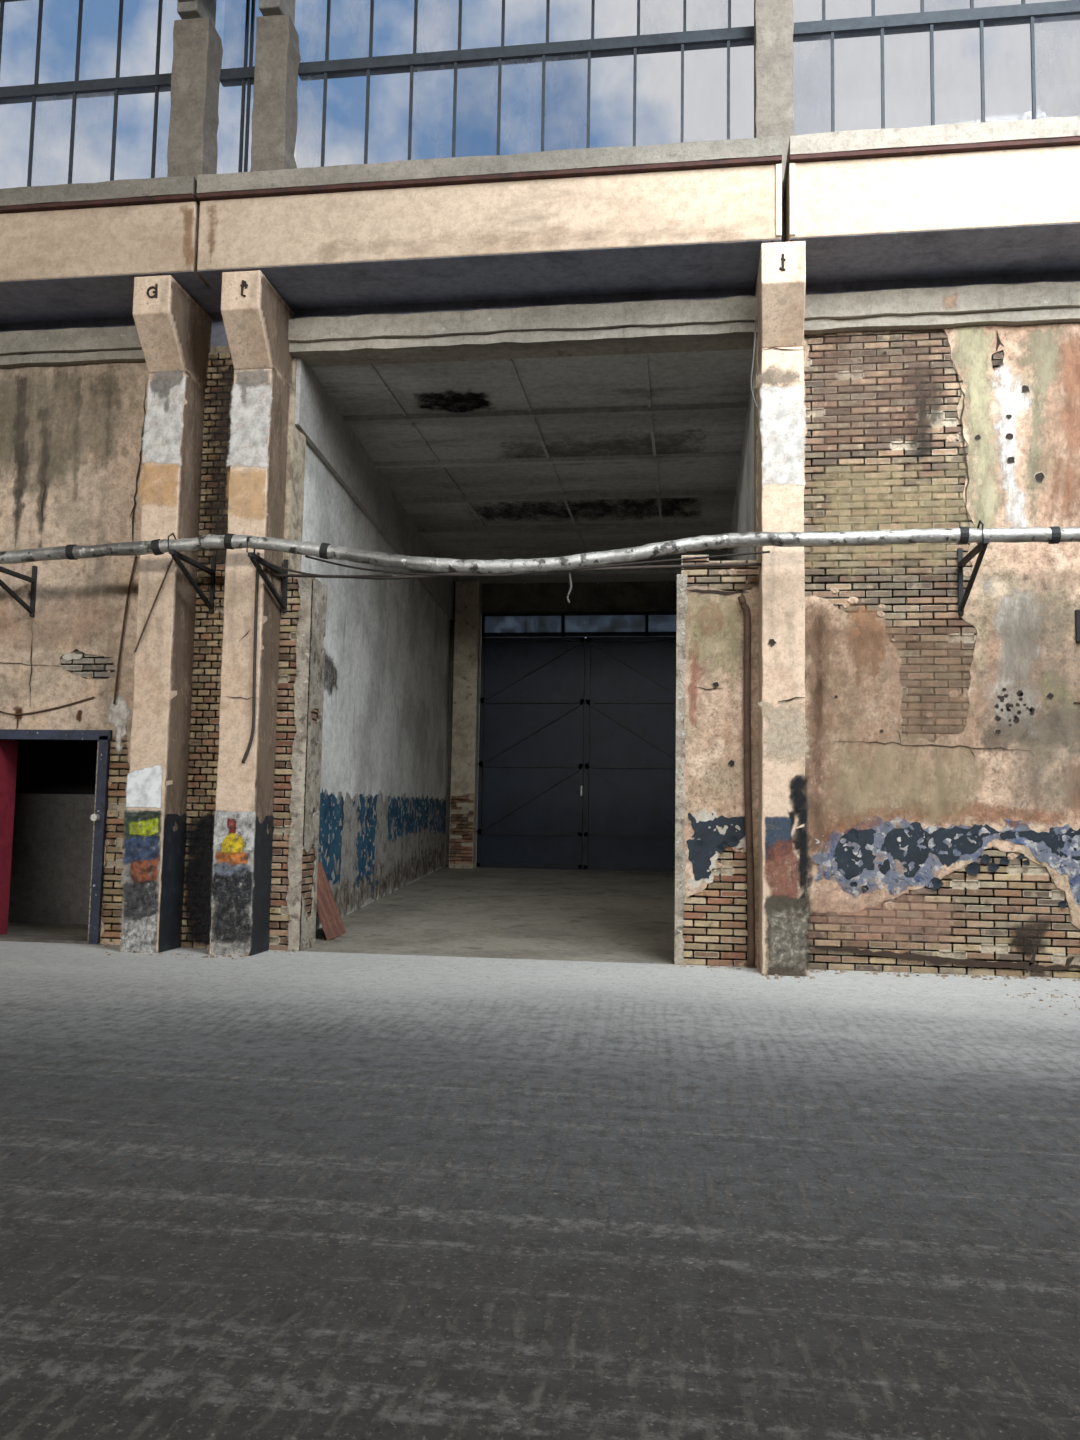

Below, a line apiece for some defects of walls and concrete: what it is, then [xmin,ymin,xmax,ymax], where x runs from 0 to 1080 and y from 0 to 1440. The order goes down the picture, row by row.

damp [0,377,117,548]
spalling [804,329,981,743]
peeling [286,577,475,952]
spalling [674,555,759,967]
spalling [806,815,1080,979]